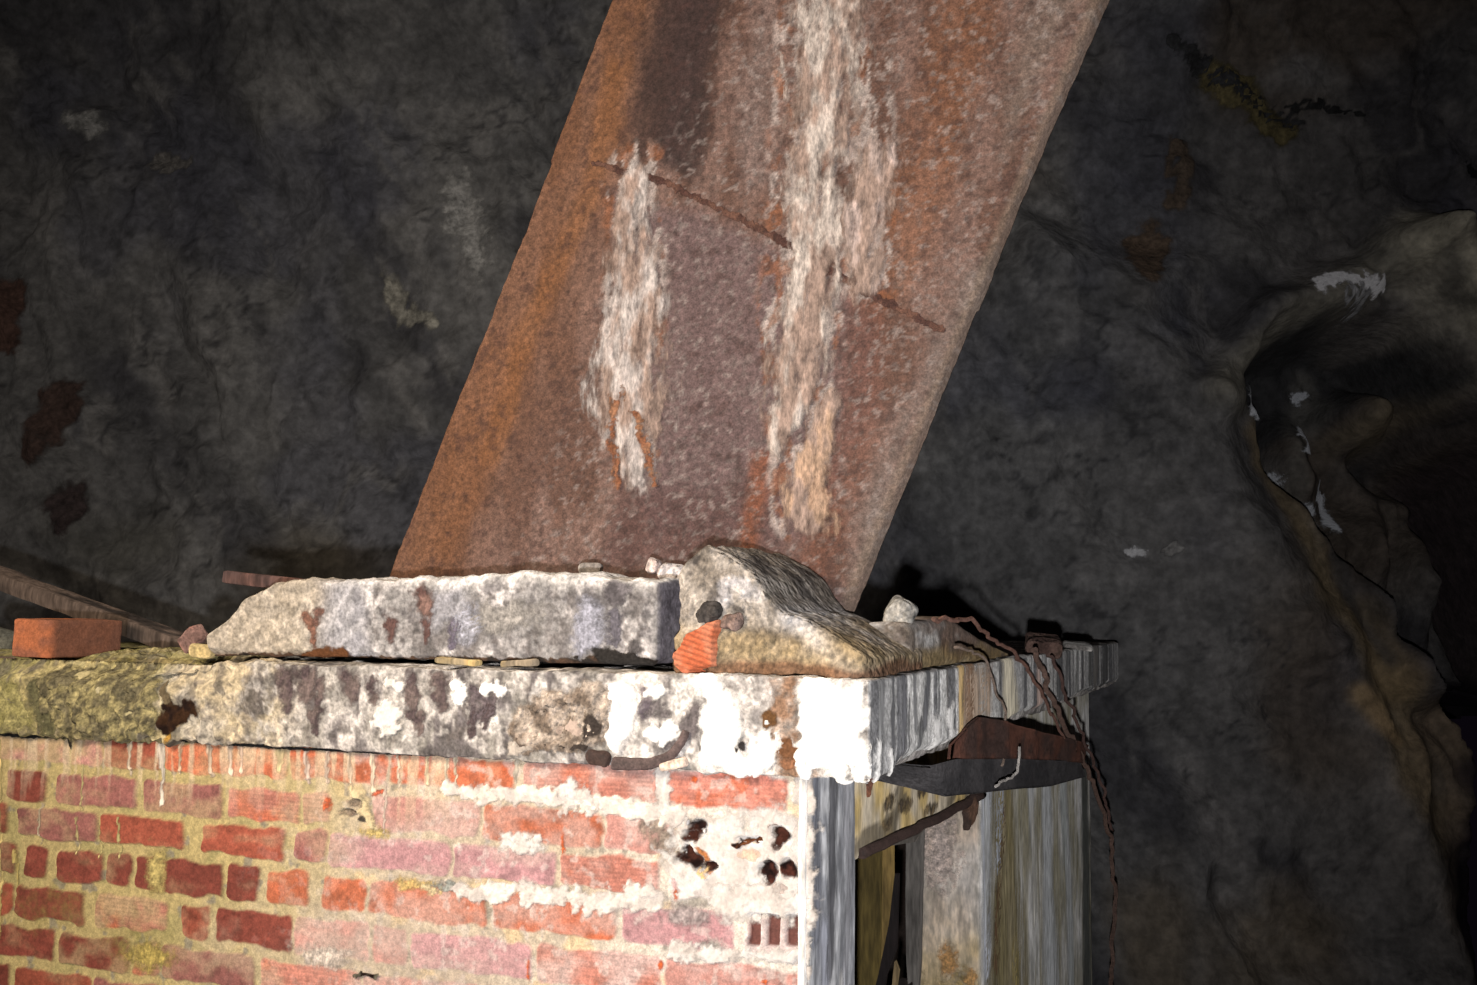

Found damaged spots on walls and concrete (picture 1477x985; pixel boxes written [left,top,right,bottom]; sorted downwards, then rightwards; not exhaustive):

damp [761,0,898,536]
damp [581,161,670,492]
rust [606,385,657,490]
damp [395,669,964,985]
spalling [676,819,719,879]
spalling [731,825,797,894]
rust [866,777,875,797]
crack [352,971,379,980]